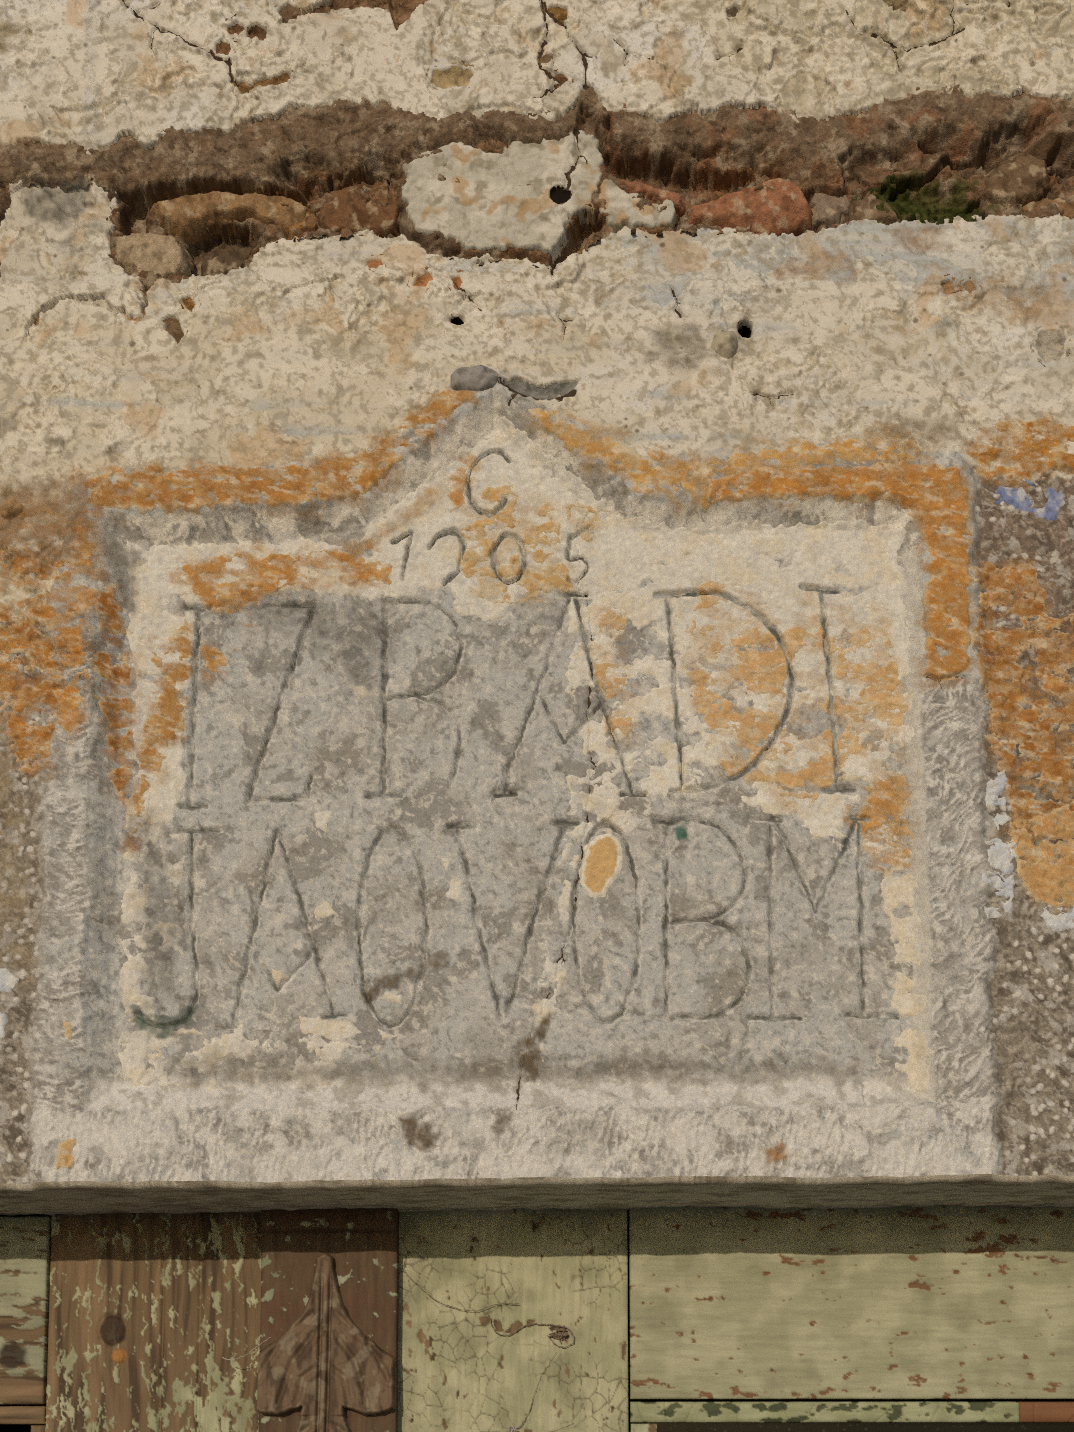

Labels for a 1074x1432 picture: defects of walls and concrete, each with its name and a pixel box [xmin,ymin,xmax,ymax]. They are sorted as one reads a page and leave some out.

crack [122,0,237,85]
spalling [211,14,293,94]
crack [533,0,651,98]
spalling [0,50,1074,344]
peeling [0,376,1074,1092]
peeling [55,1138,76,1170]